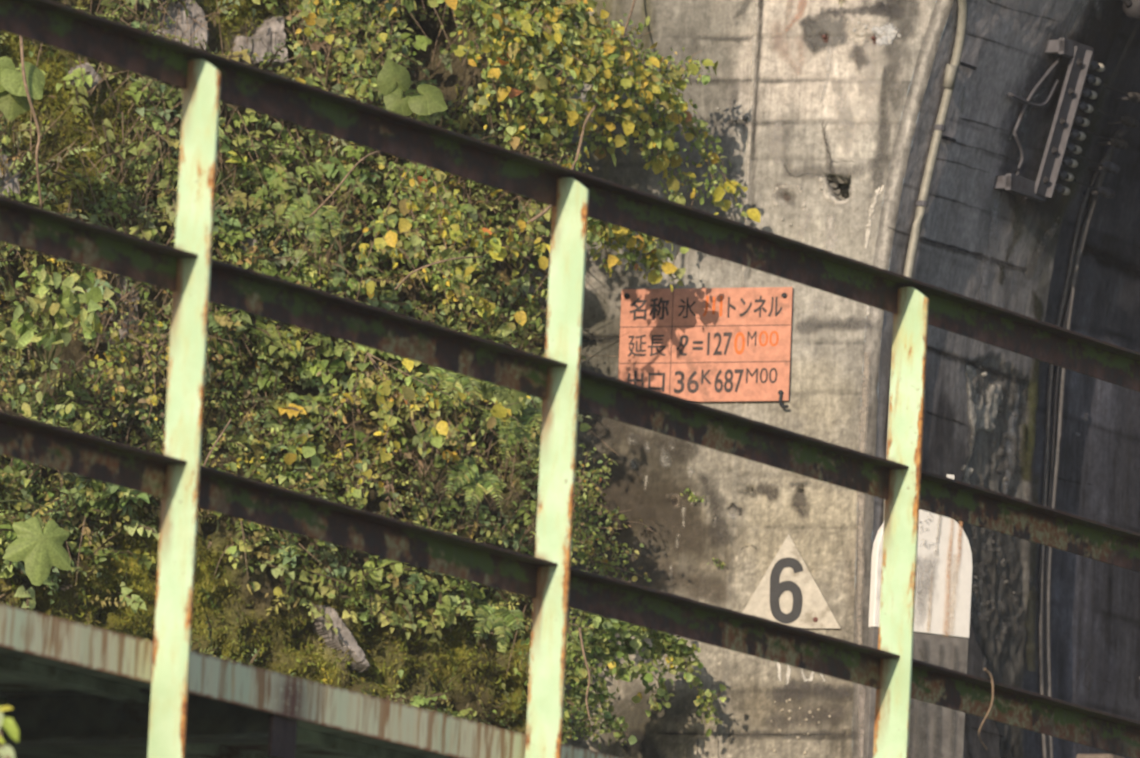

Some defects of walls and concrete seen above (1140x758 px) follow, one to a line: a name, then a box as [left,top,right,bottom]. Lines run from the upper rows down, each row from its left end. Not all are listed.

spalling [819,175,852,205]
leakage [980,27,1137,304]
leakage [1001,0,1123,173]